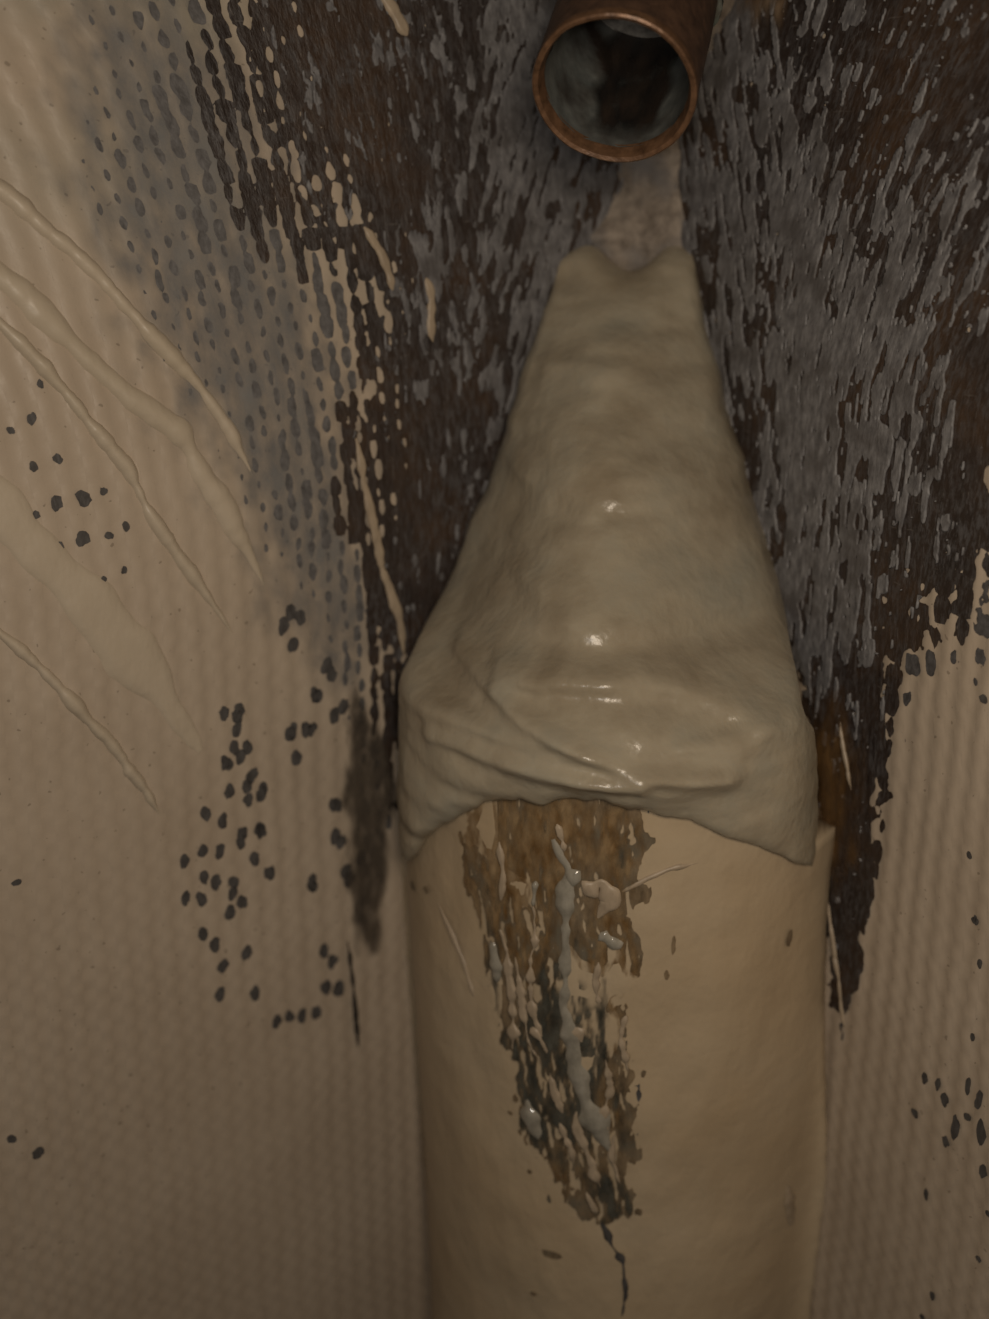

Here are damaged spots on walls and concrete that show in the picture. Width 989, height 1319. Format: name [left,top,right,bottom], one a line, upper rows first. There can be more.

damp [108,28,356,625]
damp [343,698,393,952]
peeling [458,798,656,1225]